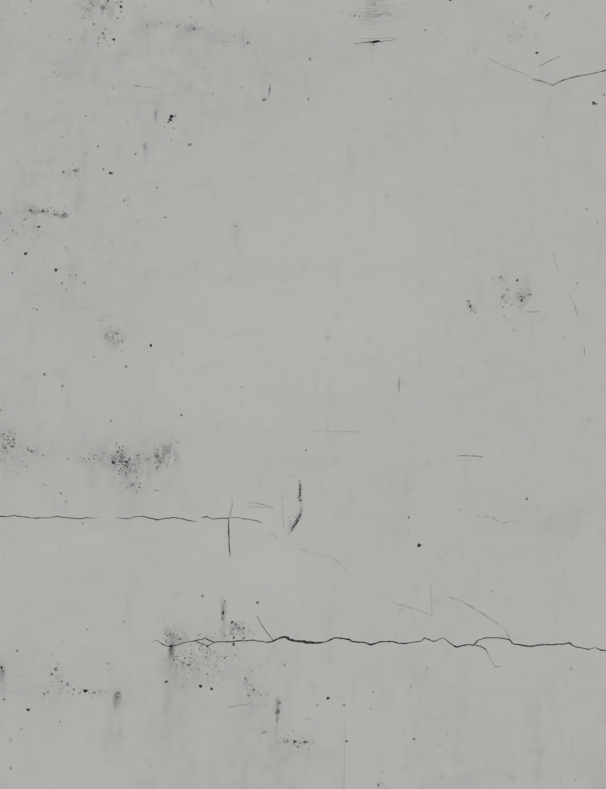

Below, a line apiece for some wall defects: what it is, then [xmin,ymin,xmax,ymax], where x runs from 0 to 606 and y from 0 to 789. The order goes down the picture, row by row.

crack [125,516,243,552]
crack [161,627,606,651]